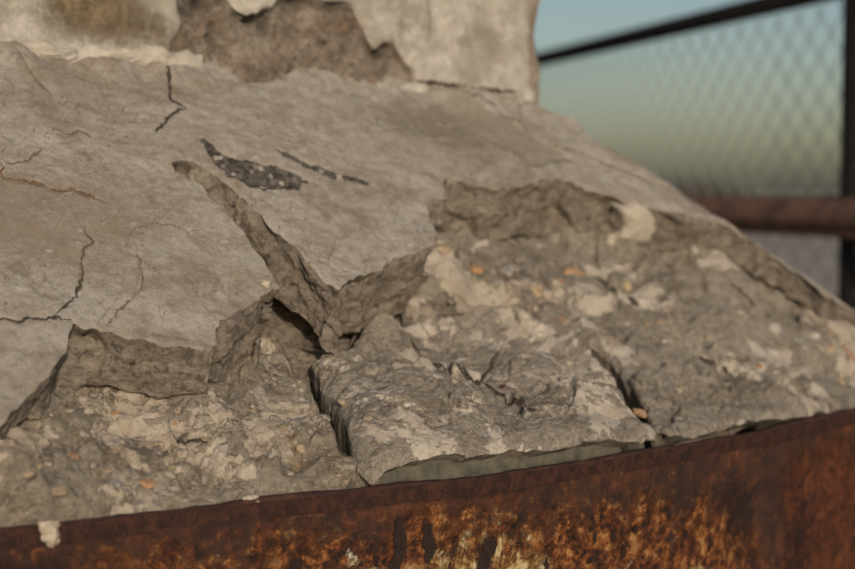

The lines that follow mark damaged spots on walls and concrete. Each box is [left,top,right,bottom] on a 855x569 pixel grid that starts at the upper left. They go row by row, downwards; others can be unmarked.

spalling [170,0,416,86]
crack [155,65,187,132]
crack [0,147,109,204]
spalling [199,138,369,191]
crack [0,225,94,324]
crack [107,221,190,325]
crack [171,160,348,357]
spalling [340,174,855,334]
spalling [0,288,280,440]
spalling [299,335,323,350]
crack [411,340,536,412]
rust [0,411,855,569]